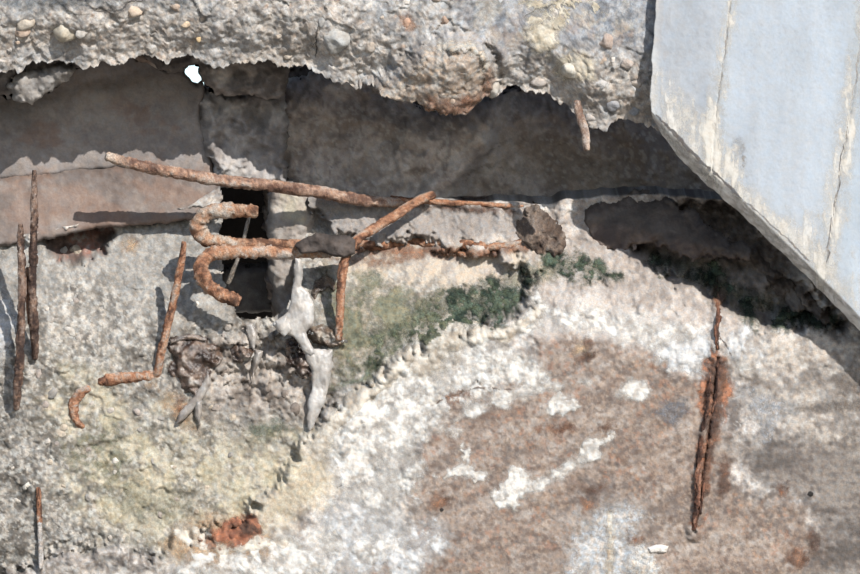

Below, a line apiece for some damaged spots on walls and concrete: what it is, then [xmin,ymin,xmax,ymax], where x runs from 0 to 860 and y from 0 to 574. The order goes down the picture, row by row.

spalling [0,0,659,574]
water stain [174,289,711,574]
peeling [648,544,669,553]
corrosion [694,348,733,495]
spalling [629,193,817,531]
water stain [726,326,768,372]